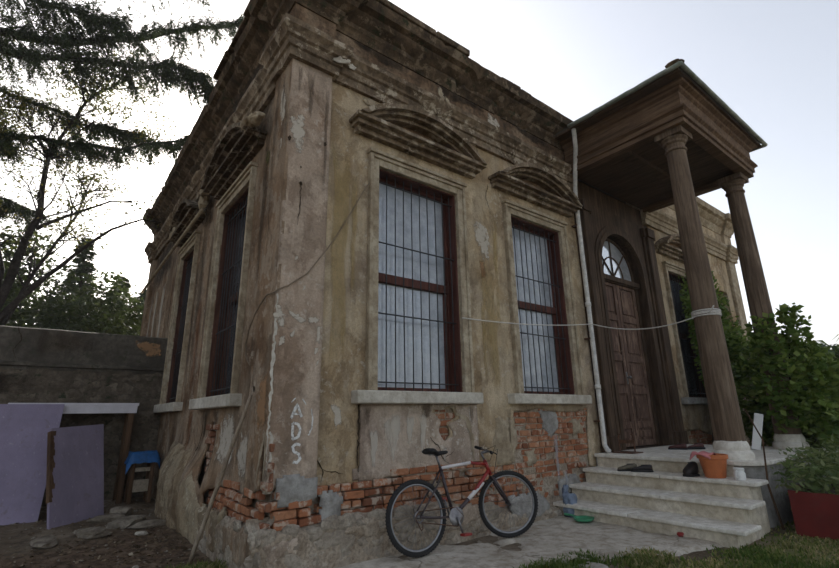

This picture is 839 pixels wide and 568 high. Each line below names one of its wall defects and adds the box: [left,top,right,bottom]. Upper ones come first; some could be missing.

spalling [280,89,305,153]
peeling [474,222,490,277]
flaking render [205,293,591,531]